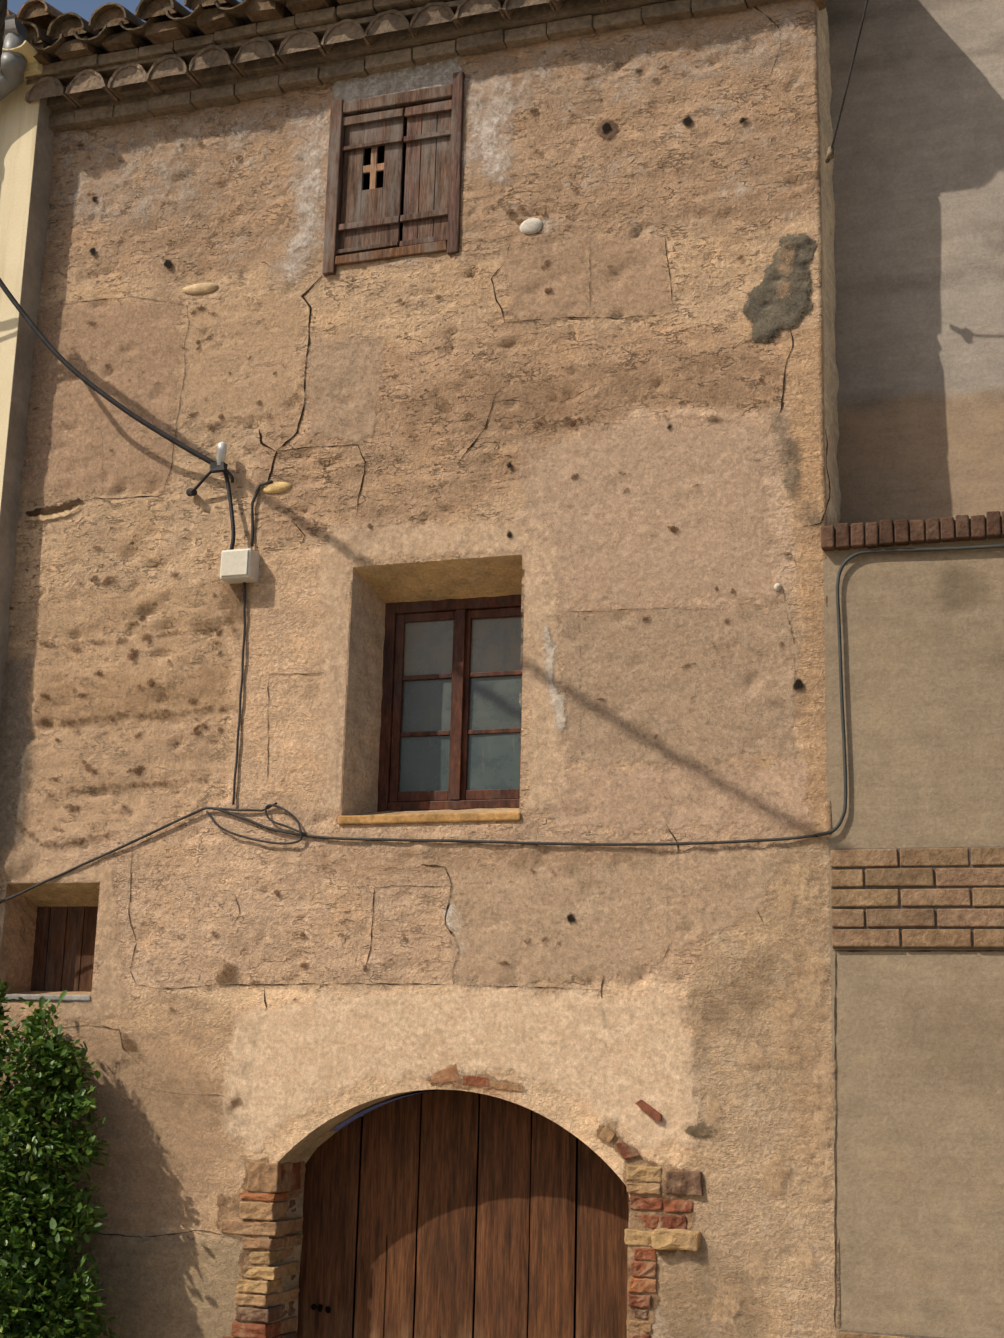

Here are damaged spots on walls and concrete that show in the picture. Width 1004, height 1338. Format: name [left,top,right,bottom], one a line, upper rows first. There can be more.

crack [259,277,388,542]
peeling [216,844,821,1338]